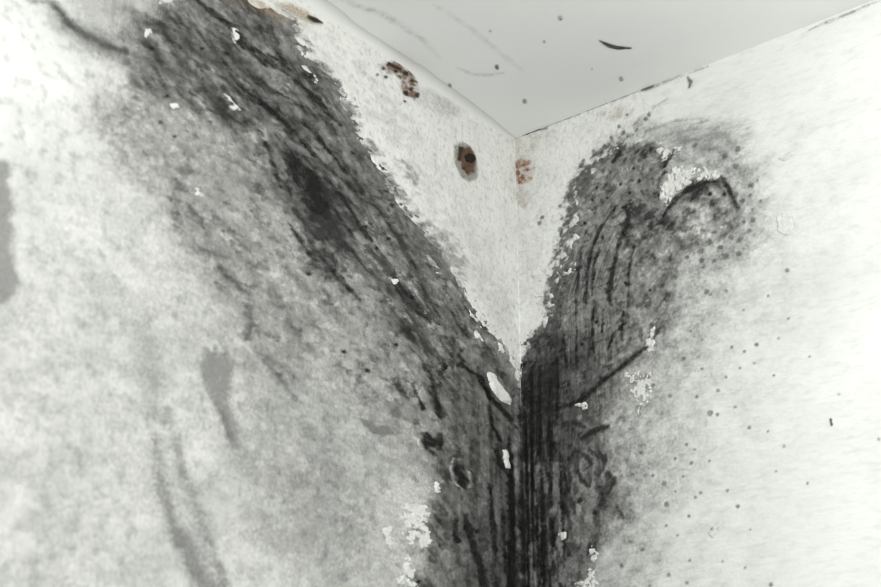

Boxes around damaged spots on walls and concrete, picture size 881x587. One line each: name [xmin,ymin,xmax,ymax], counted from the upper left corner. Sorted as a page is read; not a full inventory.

corrosion [377,61,419,102]
corrosion [455,142,477,181]
corrosion [515,160,531,184]
water stain [73,0,761,587]